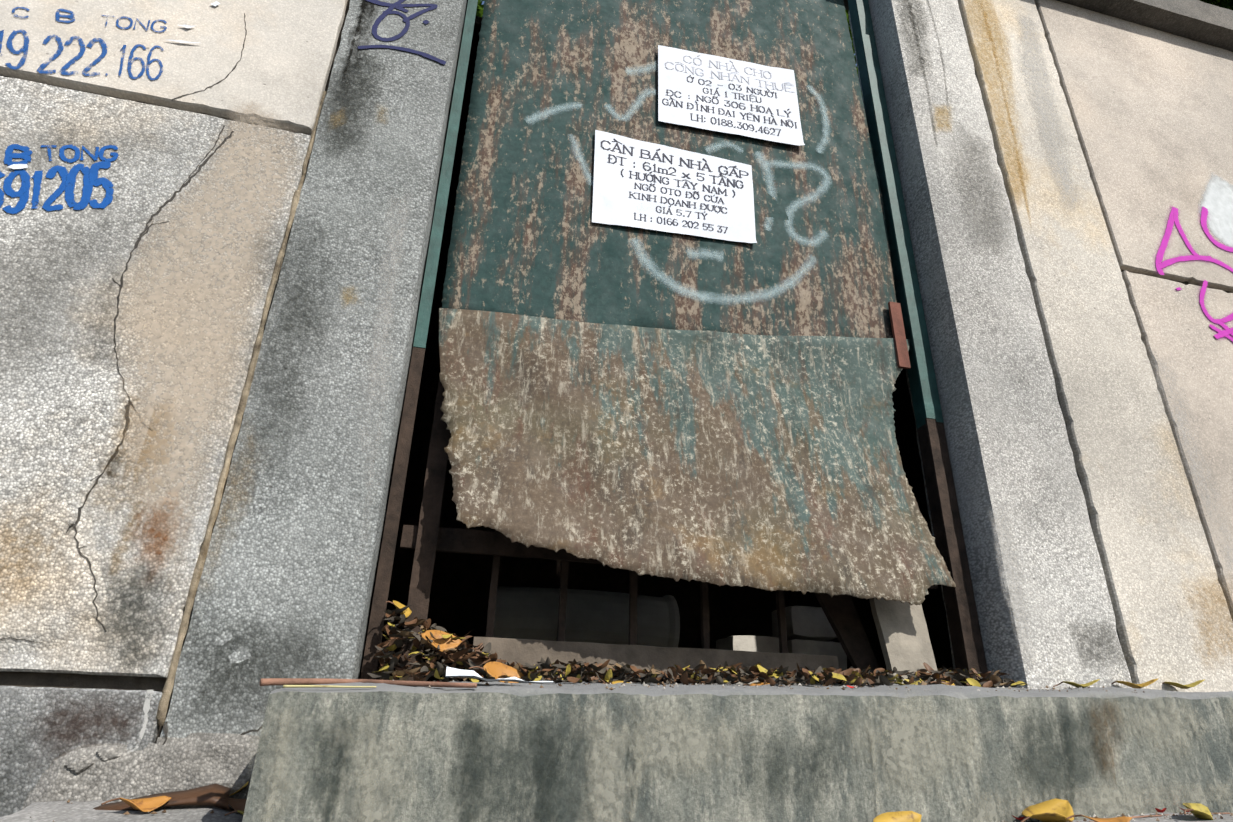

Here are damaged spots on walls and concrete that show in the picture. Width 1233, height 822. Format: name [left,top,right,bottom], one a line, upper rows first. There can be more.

crack [171,13,247,101]
water stain [343,0,374,78]
crack [66,125,234,632]